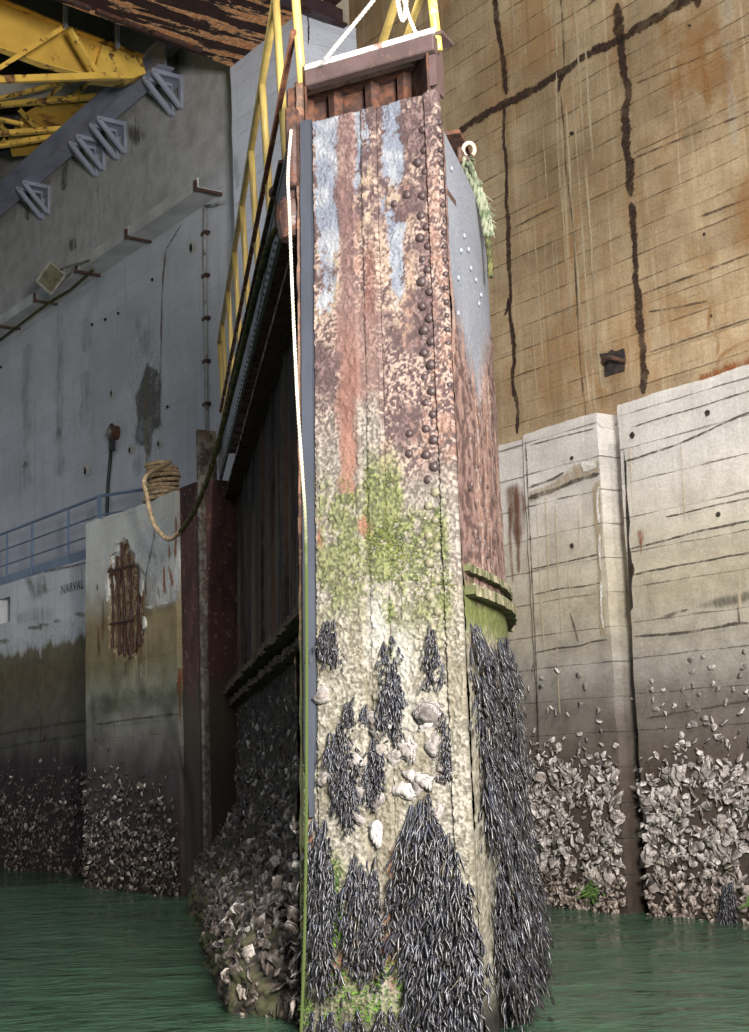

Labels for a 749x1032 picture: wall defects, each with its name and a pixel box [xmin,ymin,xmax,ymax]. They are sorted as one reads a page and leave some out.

spalling [128,363,162,463]
crack [457,0,749,741]
spalling [105,518,179,661]